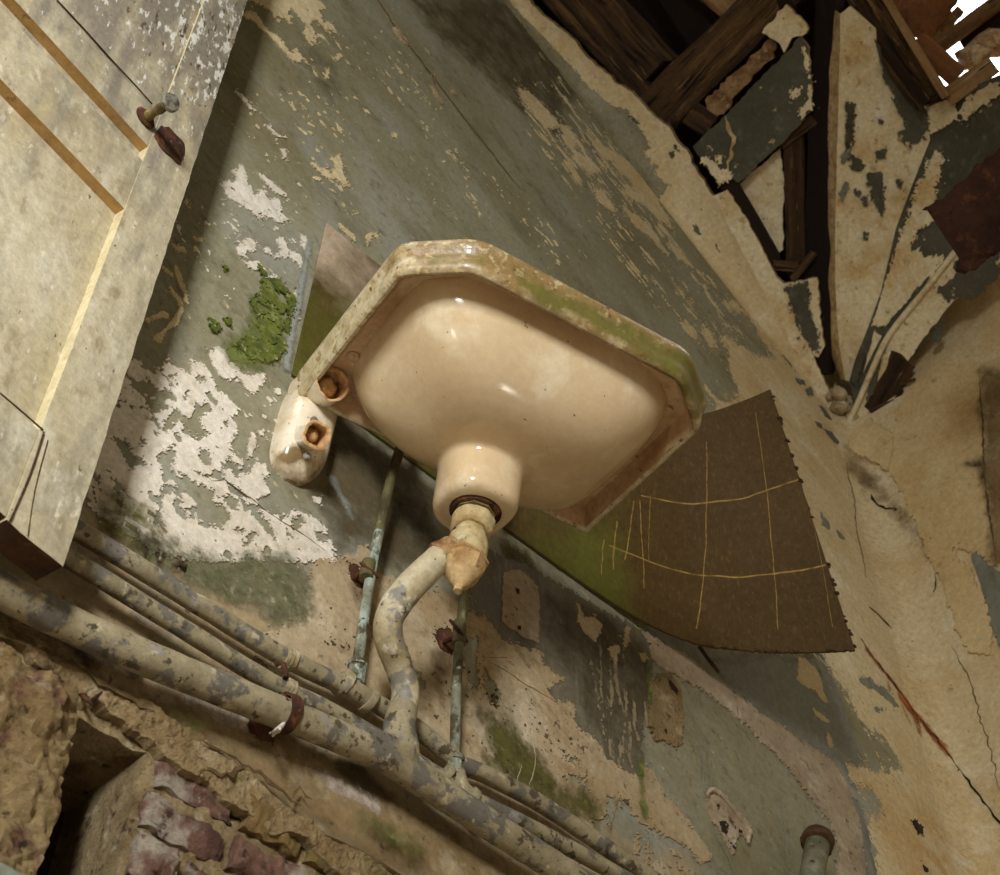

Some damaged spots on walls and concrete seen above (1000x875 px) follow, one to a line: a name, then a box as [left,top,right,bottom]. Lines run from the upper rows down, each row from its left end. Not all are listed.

peeling [213,164,295,226]
peeling [234,233,313,281]
peeling [310,152,354,190]
peeling [338,223,381,246]
crack [378,0,521,189]
peeling [513,78,694,272]
peeling [700,154,734,186]
peeling [780,10,1000,401]
peeling [403,278,980,875]
flaking render [0,612,397,875]
rust [866,648,947,752]
crack [861,638,1000,823]